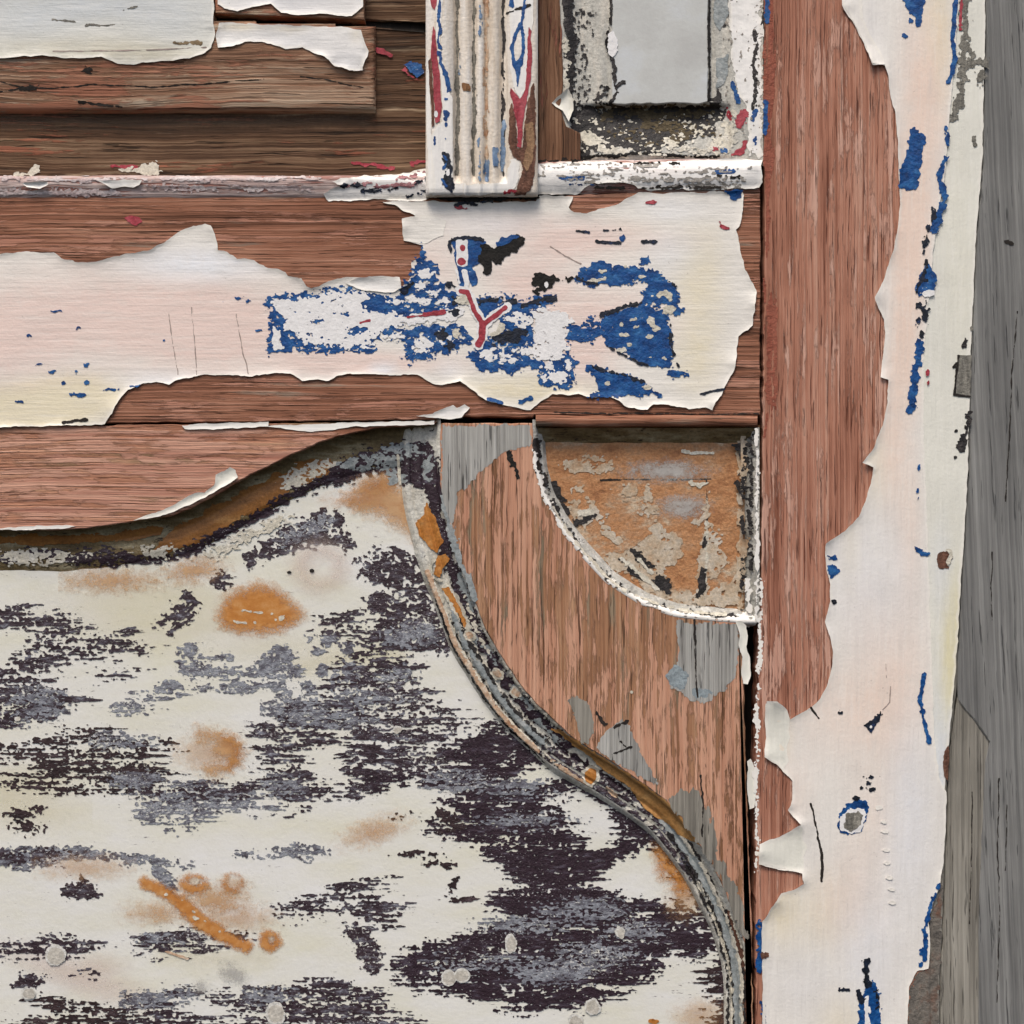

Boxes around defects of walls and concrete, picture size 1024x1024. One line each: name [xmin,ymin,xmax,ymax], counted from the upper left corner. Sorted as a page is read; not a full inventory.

peeling [0,0,764,428]
peeling [133,467,238,521]
rust [217,583,302,634]
rust [347,475,476,641]
peeling [183,0,986,1024]
rust [139,874,282,953]